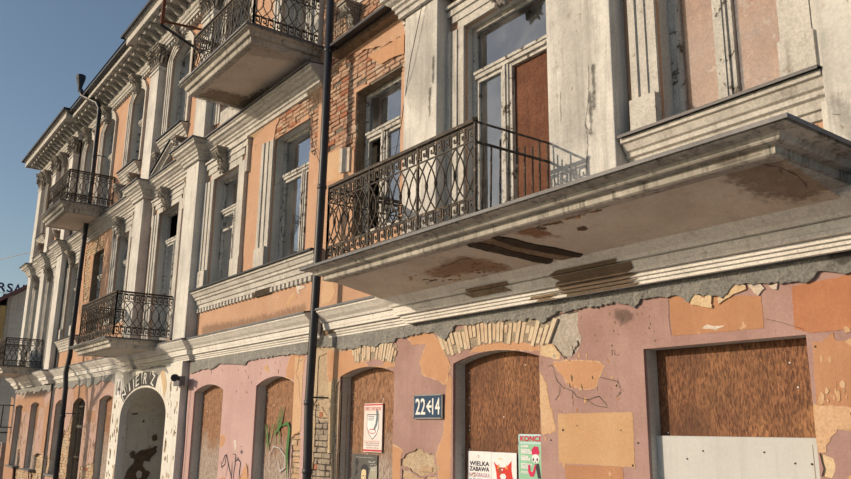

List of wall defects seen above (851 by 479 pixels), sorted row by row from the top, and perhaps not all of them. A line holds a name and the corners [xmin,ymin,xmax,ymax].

flaking render [275,97,319,156]
flaking render [327,35,405,182]
water stain [718,152,845,200]
peeling [408,263,511,298]
peeling [480,239,639,302]
flaking render [690,283,779,308]
flaking render [392,312,620,479]
crack [550,365,621,408]
peeling [812,381,851,479]